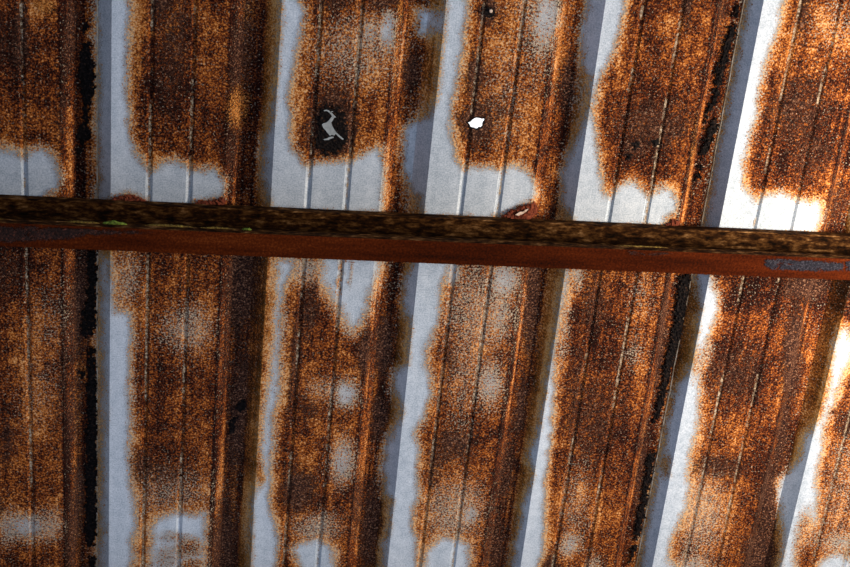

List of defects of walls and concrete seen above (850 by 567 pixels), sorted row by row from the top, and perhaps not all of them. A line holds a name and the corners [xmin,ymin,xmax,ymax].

rust [0,0,753,227]
rust [740,0,850,233]
rust [0,246,850,567]